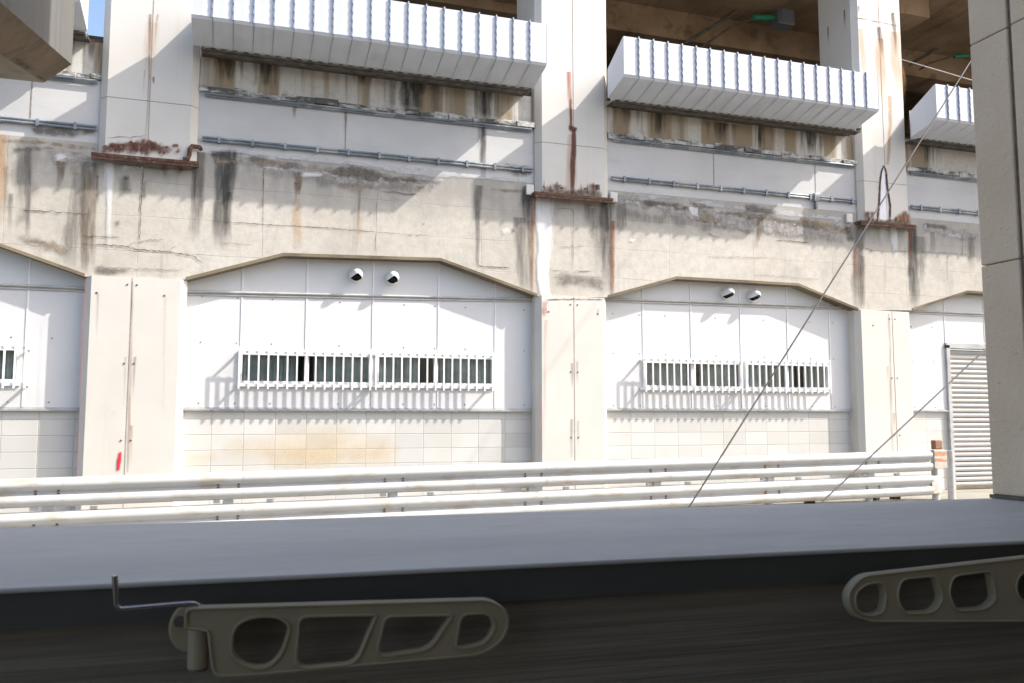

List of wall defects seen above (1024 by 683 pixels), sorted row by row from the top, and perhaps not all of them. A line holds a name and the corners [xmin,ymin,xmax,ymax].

leakage [402,82,436,108]
rust [102,136,179,155]
leakage [194,150,236,226]
crack [20,165,420,263]
rust [531,72,600,280]